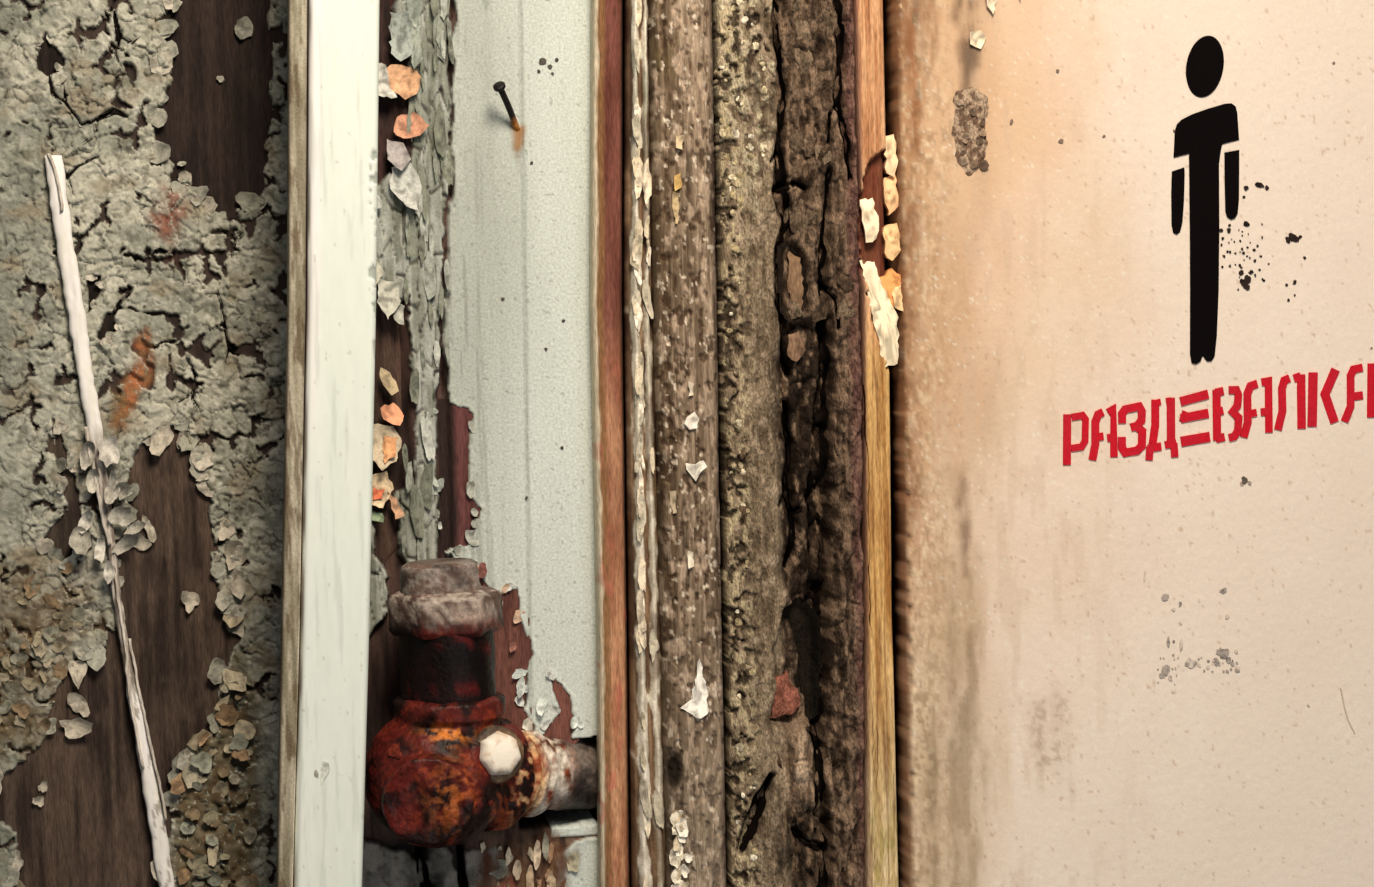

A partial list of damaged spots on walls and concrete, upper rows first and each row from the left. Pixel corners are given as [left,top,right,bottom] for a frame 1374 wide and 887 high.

peeling [29,35,65,76]
peeling [145,0,279,220]
rust [515,127,523,151]
water stain [962,40,975,73]
peeling [84,274,130,345]
peeling [372,0,481,563]
spalling [859,134,903,367]
peeling [0,416,260,887]
peeling [477,562,584,744]